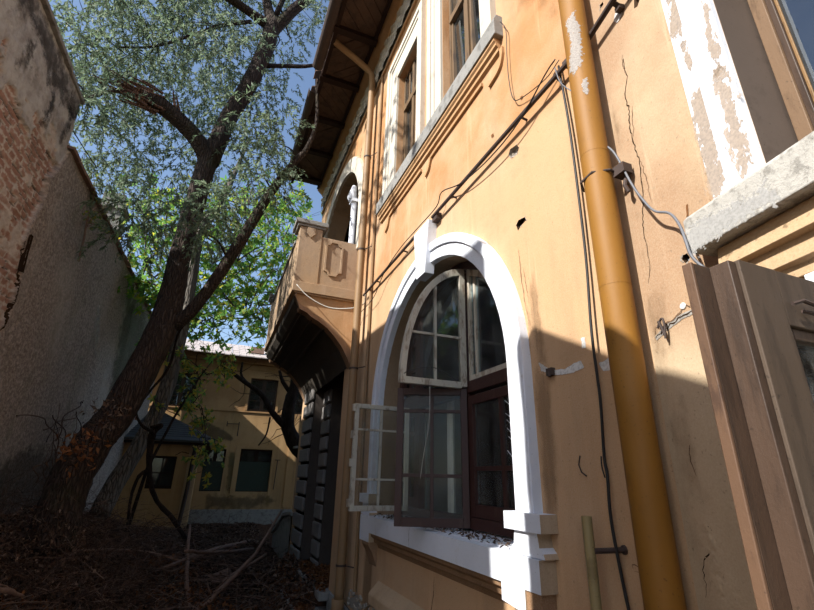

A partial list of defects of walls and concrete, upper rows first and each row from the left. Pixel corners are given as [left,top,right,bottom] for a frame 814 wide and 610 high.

peeling [565,10,585,75]
peeling [666,0,693,71]
crack [622,55,651,281]
peeling [680,1,780,264]
crack [0,241,26,331]
spalling [18,234,34,274]
spalling [655,305,692,340]